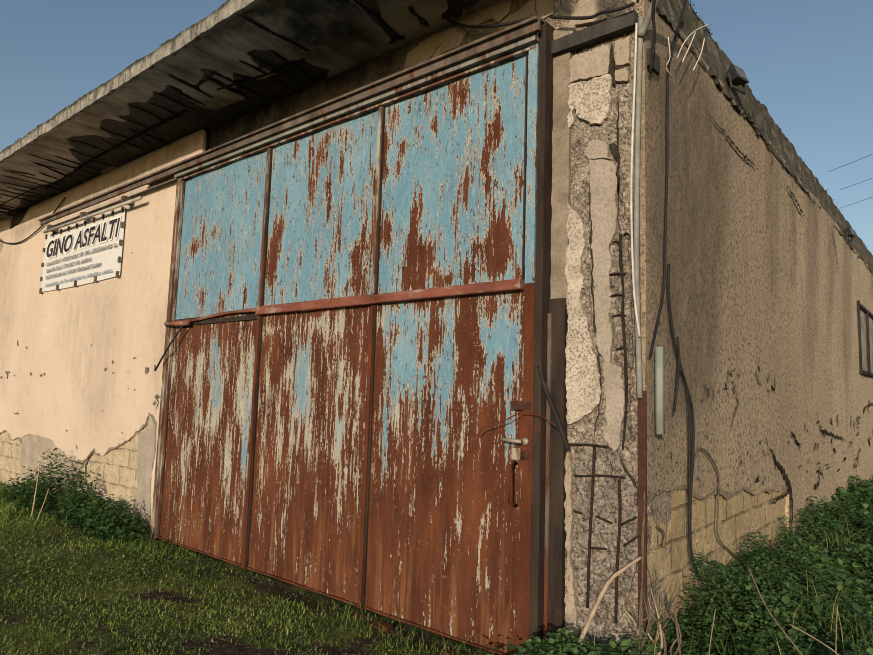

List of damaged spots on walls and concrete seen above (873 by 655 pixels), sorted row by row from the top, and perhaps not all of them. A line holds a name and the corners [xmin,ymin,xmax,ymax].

spalling [0,18,329,229]
peeling [567,37,631,129]
spalling [0,394,158,536]
spalling [564,139,791,649]
peeling [798,400,871,490]